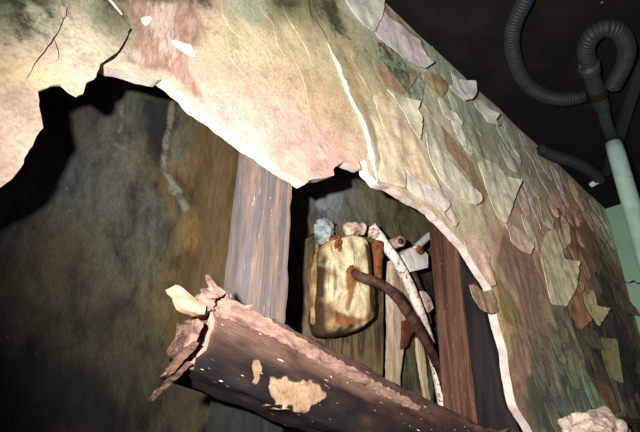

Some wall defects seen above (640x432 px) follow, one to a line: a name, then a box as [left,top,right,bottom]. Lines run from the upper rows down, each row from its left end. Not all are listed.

crack [26,8,68,78]
damp [144,99,190,213]
peeling [346,0,640,432]
rust [364,243,372,275]
rust [335,266,374,325]
rust [419,291,434,312]
peeling [252,360,262,384]
peeling [266,376,326,413]